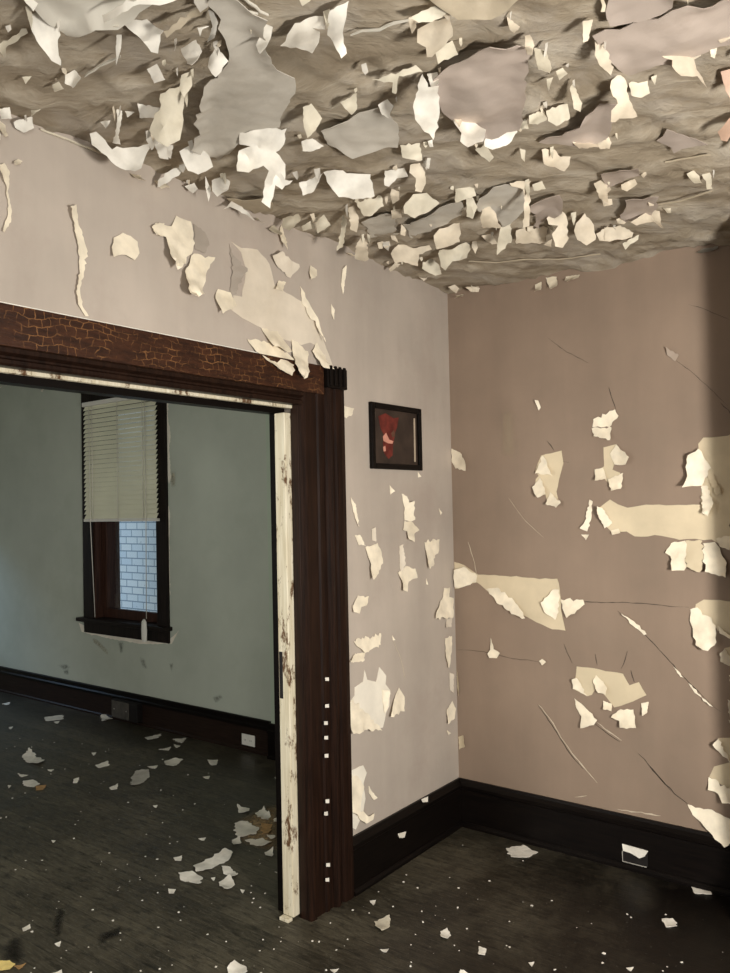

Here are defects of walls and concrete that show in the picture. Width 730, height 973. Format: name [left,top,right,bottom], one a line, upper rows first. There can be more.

peeling [0,0,730,379]
crack [666,347,730,412]
peeling [532,441,564,507]
peeling [580,389,730,578]
peeling [351,498,383,580]
peeling [389,485,440,592]
peeling [353,596,369,614]
peeling [350,633,405,734]
crack [619,612,718,710]
peeling [690,600,730,676]
crack [539,705,595,780]
peeling [649,738,730,847]